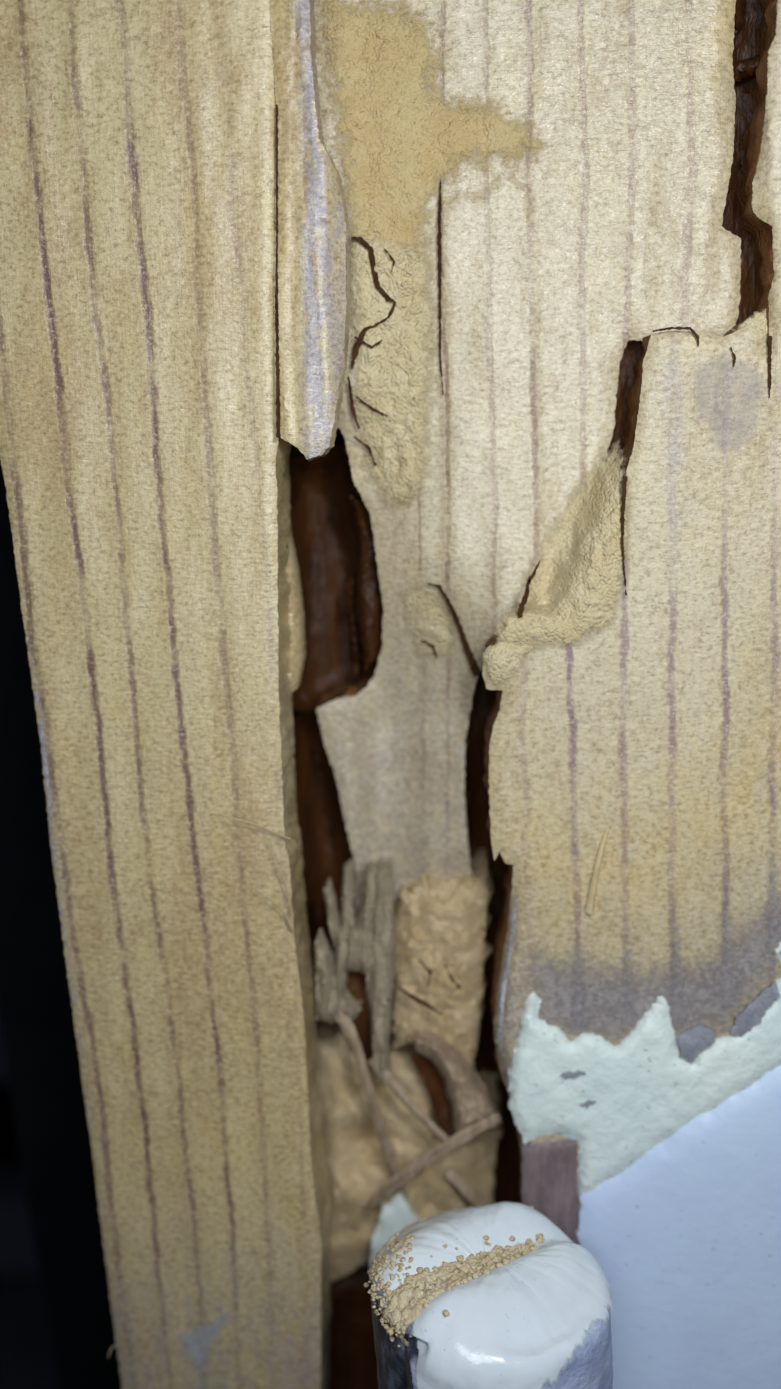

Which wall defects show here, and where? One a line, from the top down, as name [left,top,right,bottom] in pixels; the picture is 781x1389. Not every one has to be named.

crack [347,236,396,466]
crack [436,178,444,395]
crack [652,326,772,398]
crack [421,561,540,677]
crack [620,476,628,596]
peeling [507,942,781,1245]